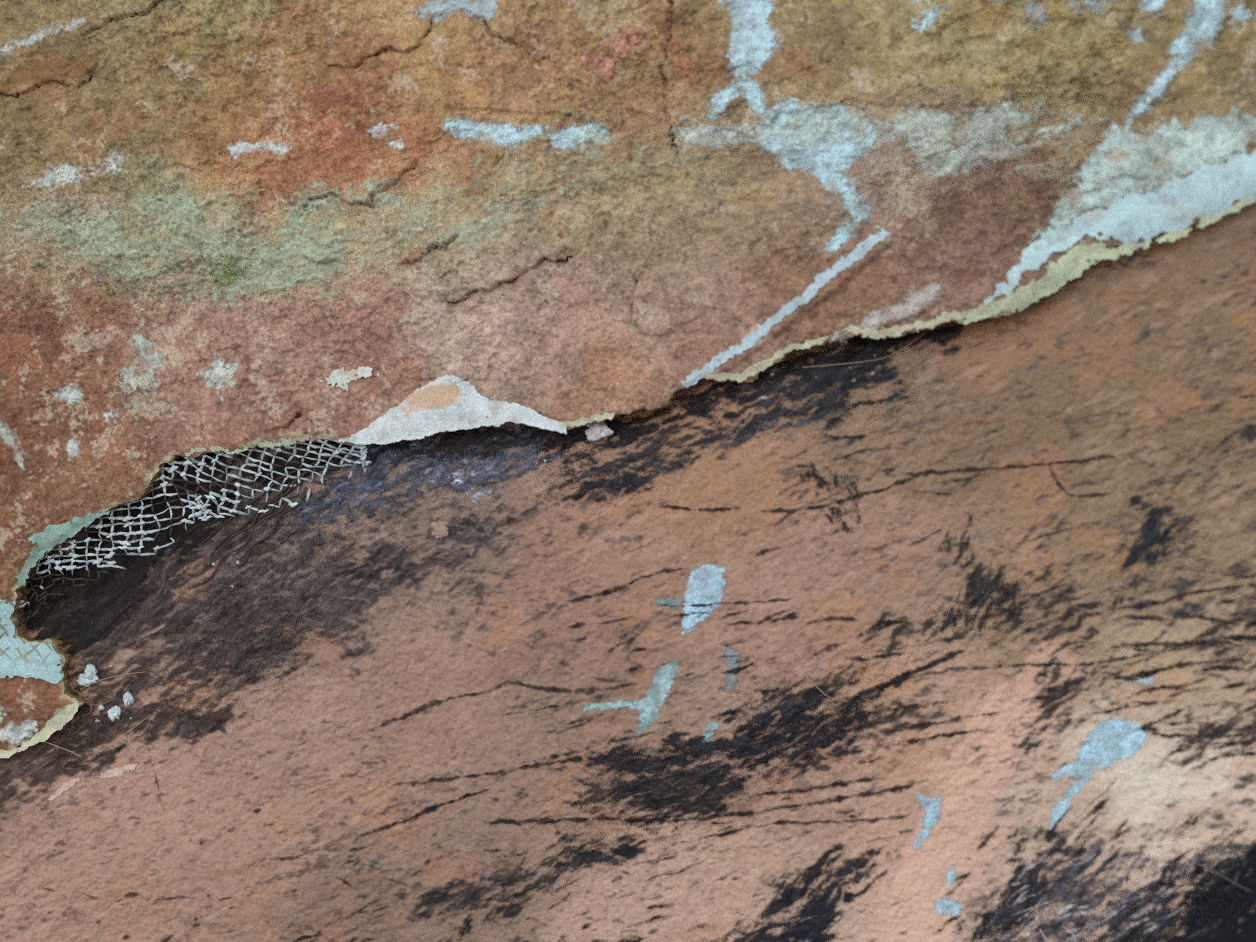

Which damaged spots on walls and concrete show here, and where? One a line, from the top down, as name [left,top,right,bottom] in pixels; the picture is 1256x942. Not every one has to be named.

crack [0,75,92,98]
peeling [675,0,1256,388]
peeling [50,383,84,405]
peeling [338,375,615,445]
peeling [185,434,310,457]
peeling [0,511,110,684]
damp [0,323,963,834]
damp [933,627,972,647]
damp [992,495,1256,769]
peeling [0,703,79,758]
damp [487,871,544,898]
damp [716,843,897,942]